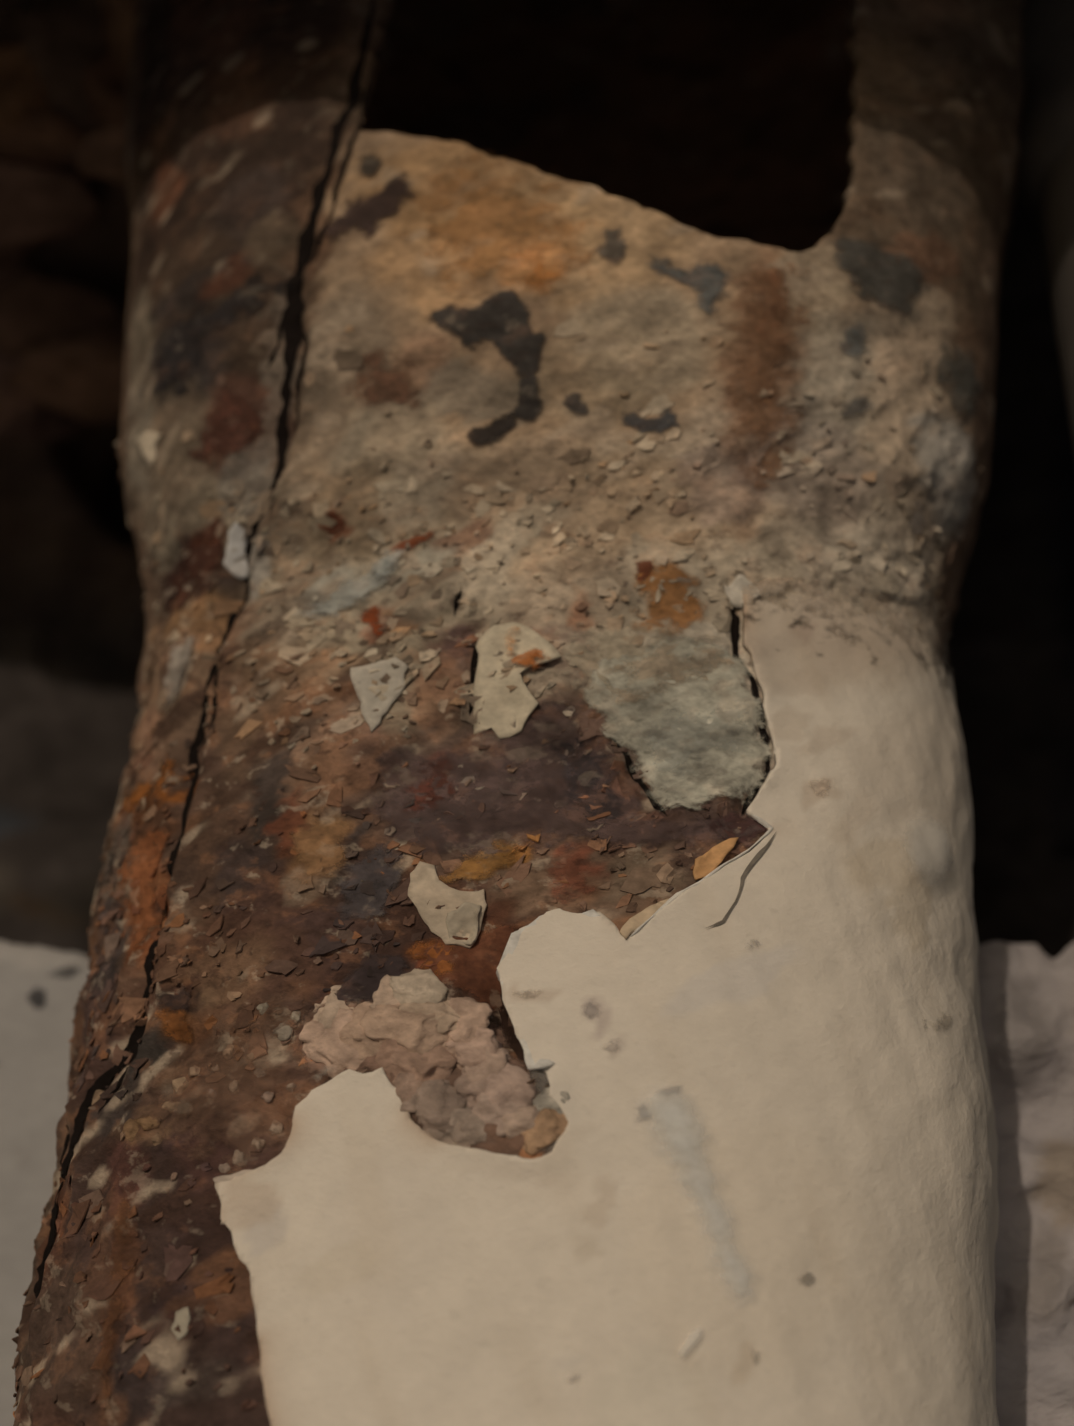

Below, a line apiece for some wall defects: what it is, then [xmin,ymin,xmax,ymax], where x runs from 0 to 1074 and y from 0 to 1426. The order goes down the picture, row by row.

damp [650,257,727,313]
damp [428,289,546,445]
damp [563,392,589,415]
crack [33,0,380,1299]
corrosion [633,560,702,635]
crack [727,584,770,816]
corrosion [336,925,517,1010]
peeling [408,861,487,949]
corrosion [294,703,767,920]
peeling [473,622,773,940]
crack [707,832,776,928]
spalling [273,968,570,1159]